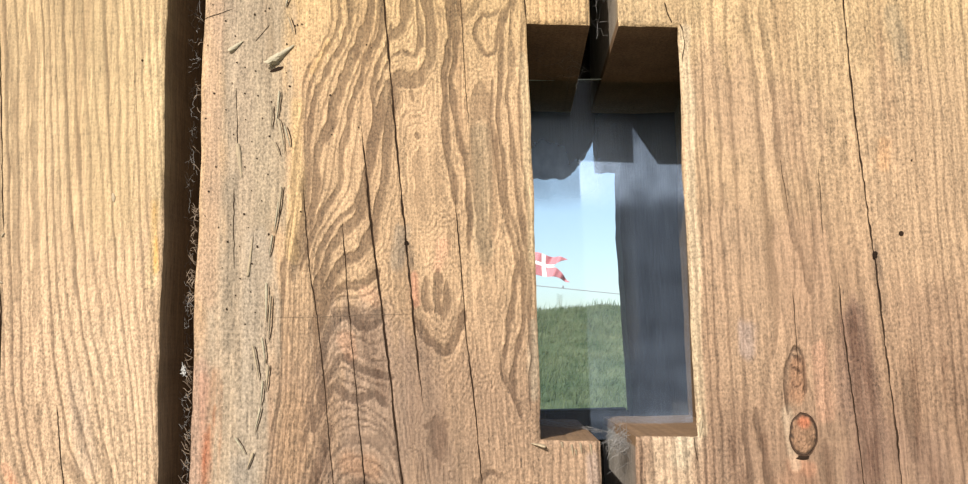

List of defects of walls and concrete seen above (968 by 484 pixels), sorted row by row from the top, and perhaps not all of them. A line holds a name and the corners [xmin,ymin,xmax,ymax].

crack [0,47,8,232]
crack [0,290,8,356]
crack [303,191,334,484]
crack [342,228,365,484]
crack [361,128,403,484]
crack [383,0,423,401]
crack [460,0,469,125]
crack [455,199,482,484]
crack [838,0,902,484]